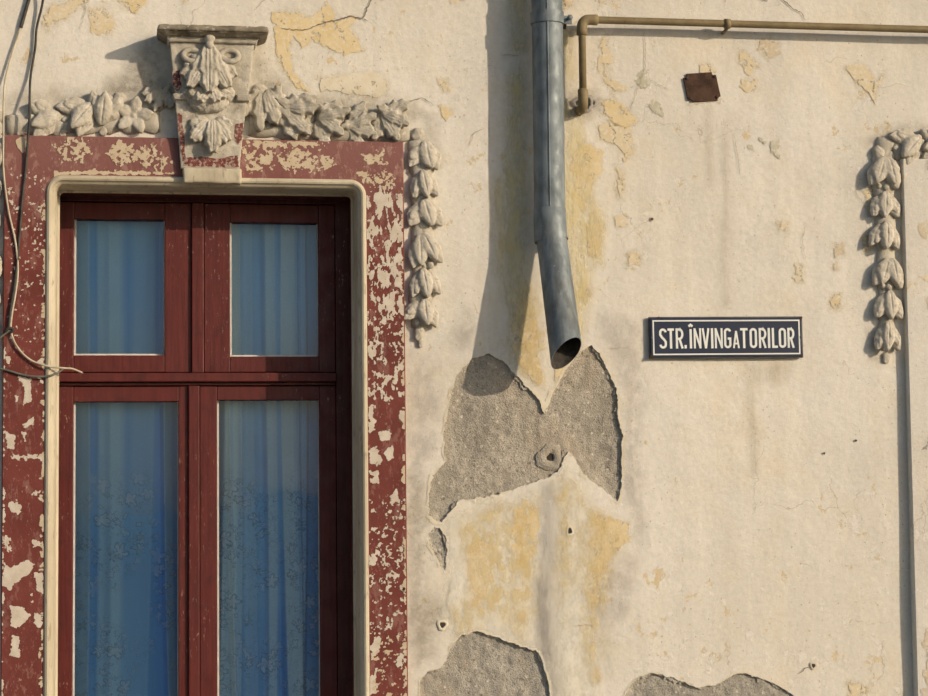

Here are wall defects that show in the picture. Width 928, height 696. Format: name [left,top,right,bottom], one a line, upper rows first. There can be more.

peeling [42,0,115,35]
crack [282,0,371,31]
peeling [271,2,387,98]
spalling [241,140,337,174]
peeling [569,38,651,212]
spalling [3,136,174,479]
spalling [356,149,407,696]
flaking render [426,318,627,571]
spalling [2,487,44,696]
flaking render [418,628,553,696]
flaking render [623,671,793,696]